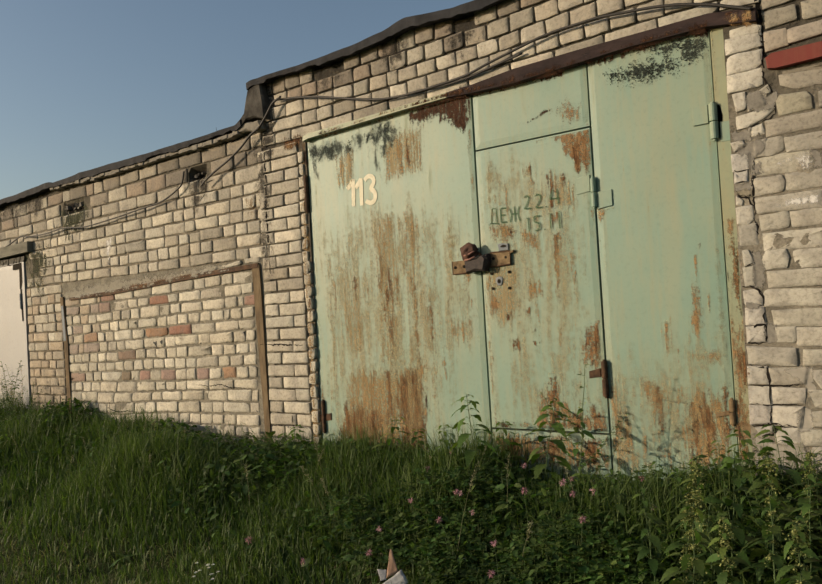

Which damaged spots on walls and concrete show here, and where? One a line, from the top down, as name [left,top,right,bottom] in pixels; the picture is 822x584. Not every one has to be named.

rust [725,11,759,27]
rust [384,23,713,184]
rust [338,153,353,185]
rust [336,211,447,454]
rust [486,259,516,324]
rust [490,224,538,248]
rust [546,172,576,293]
rust [582,320,600,369]
rust [644,220,749,471]
crack [734,160,768,345]
rust [488,377,647,470]
crack [750,365,801,437]